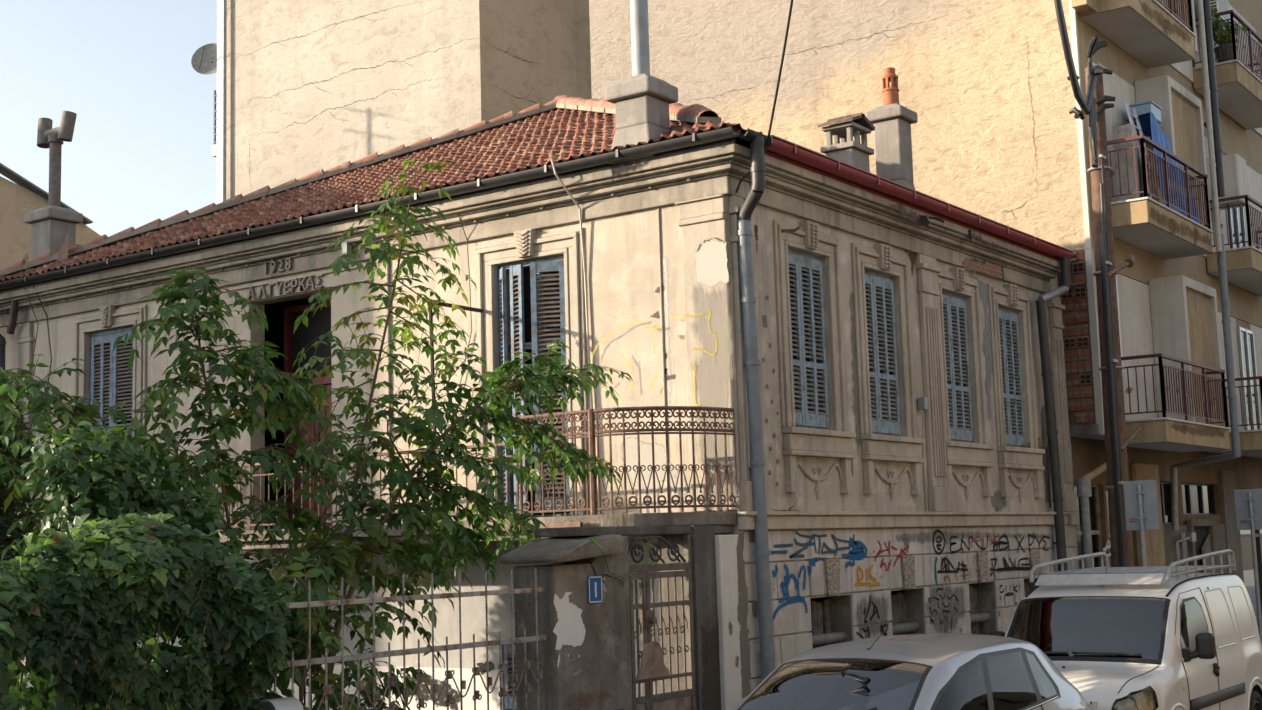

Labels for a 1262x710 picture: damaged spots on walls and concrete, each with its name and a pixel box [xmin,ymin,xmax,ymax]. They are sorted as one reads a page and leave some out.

crack [229,0,431,57]
crack [247,37,540,184]
peeling [693,238,738,510]
peeling [553,592,586,676]